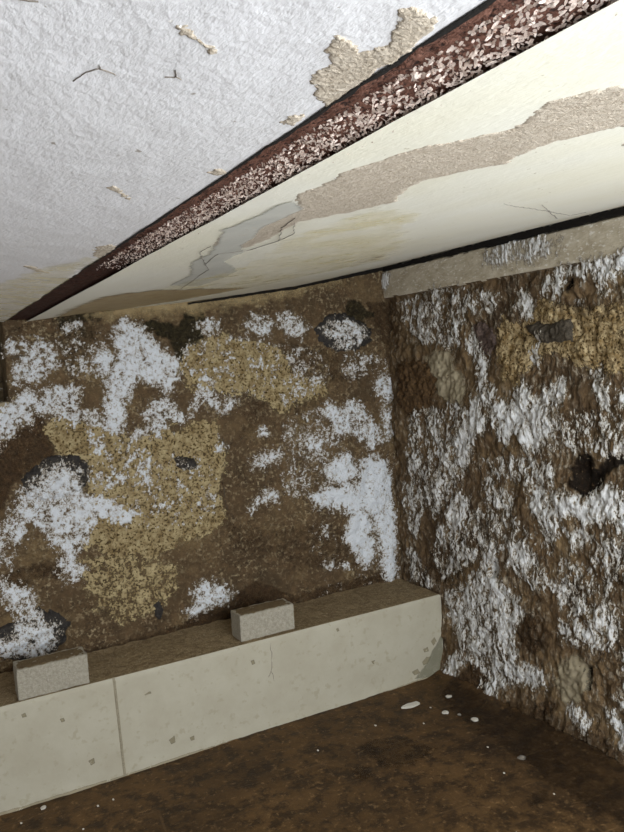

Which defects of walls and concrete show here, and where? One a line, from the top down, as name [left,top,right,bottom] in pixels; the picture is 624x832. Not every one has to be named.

rust [9,0,618,320]
peeling [310,7,438,110]
peeling [227,85,624,248]
damp [0,202,624,819]